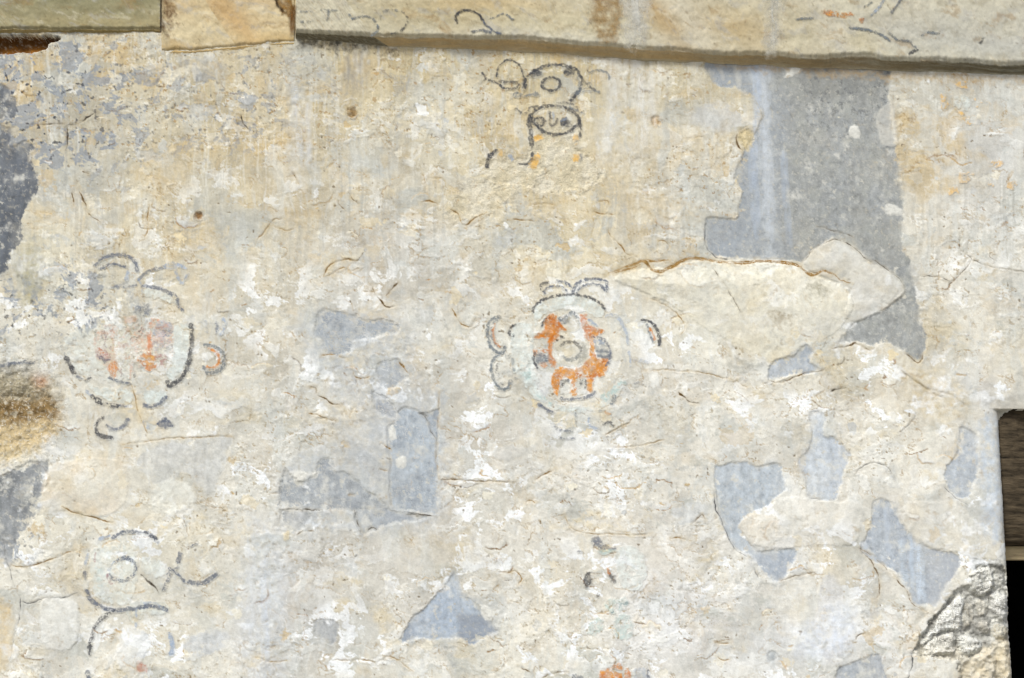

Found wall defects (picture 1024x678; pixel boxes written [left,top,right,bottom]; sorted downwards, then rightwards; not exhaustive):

peeling [0,81,43,280]
peeling [307,305,401,354]
peeling [682,62,929,360]
crack [587,196,1024,338]
spalling [0,353,71,565]
peeling [276,357,443,542]
peeling [399,567,501,648]
peeling [670,407,852,588]
peeling [856,497,1011,678]
peeling [943,422,979,500]